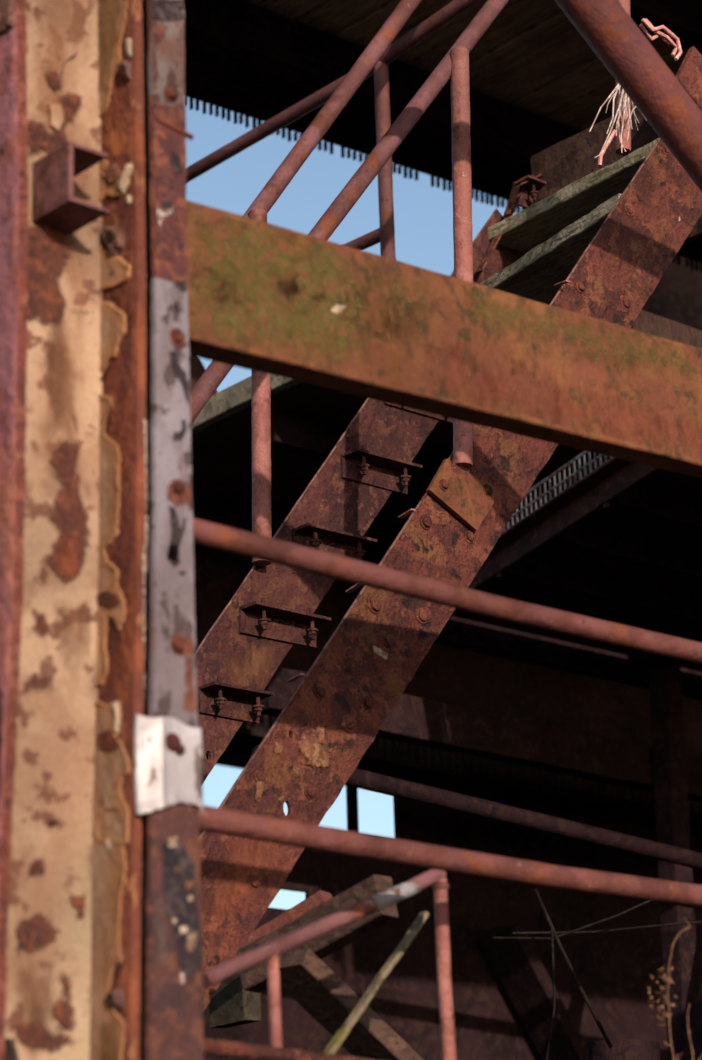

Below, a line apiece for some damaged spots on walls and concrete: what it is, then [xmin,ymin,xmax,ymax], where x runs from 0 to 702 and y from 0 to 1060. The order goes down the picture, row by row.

rust [98,0,132,91]
rust [154,103,185,125]
peeling [99,159,133,204]
peeling [99,245,132,372]
rust [168,480,191,505]
rust [33,612,51,636]
rust [24,673,52,691]
peeling [89,394,130,1060]
rust [291,724,330,778]
rust [28,858,45,876]
rust [15,913,60,952]
rust [15,972,76,1052]